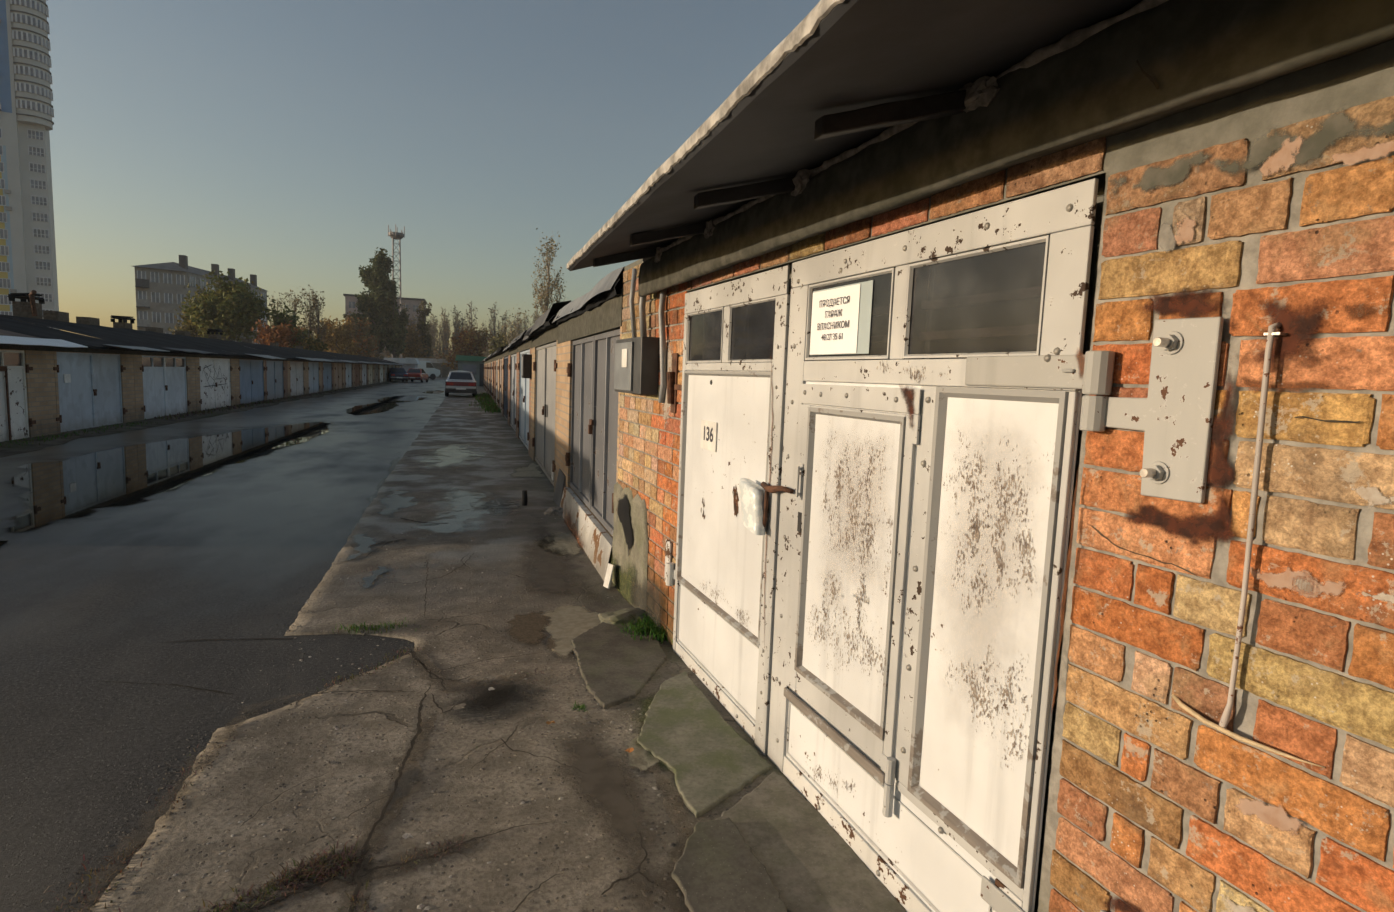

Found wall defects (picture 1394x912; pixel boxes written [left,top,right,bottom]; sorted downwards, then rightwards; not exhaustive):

peeling [1111,108,1394,193]
peeling [1174,218,1196,244]
rust [1143,289,1216,318]
rust [1345,304,1373,318]
rust [1125,299,1325,544]
crack [378,506,510,620]
crack [240,651,548,912]